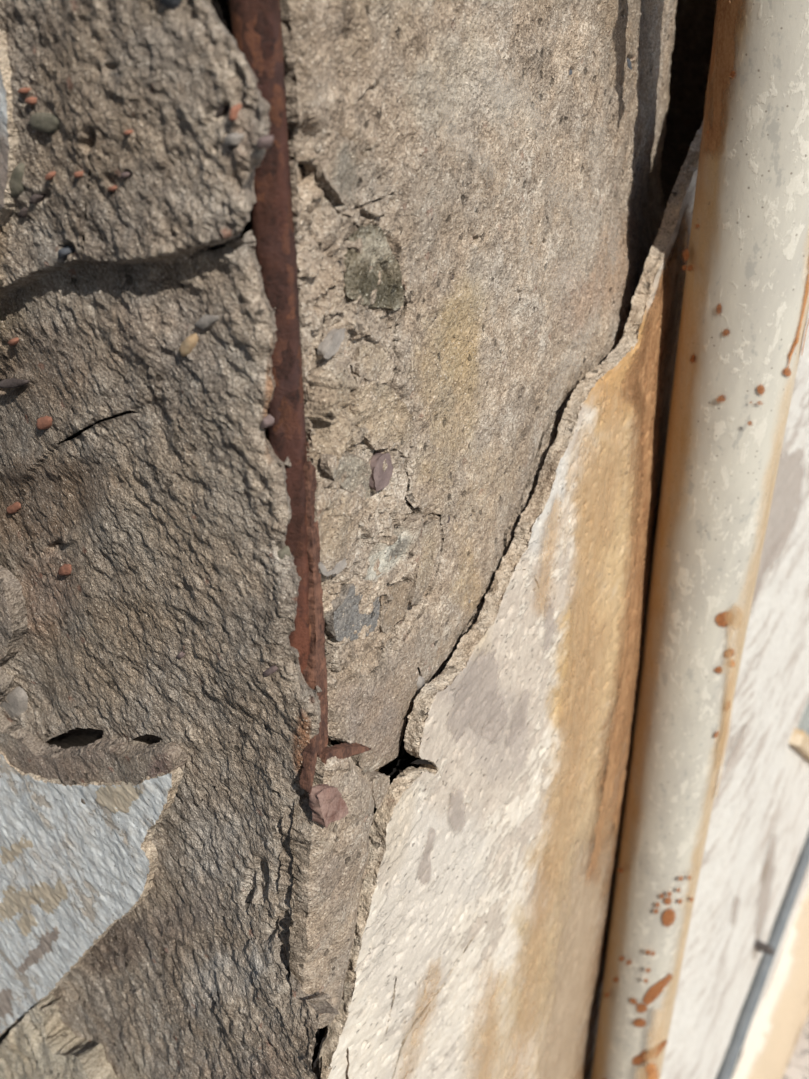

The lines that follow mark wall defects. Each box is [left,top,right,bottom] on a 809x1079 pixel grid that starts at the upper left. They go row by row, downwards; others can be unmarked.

rust [783,275,809,376]
spalling [0,0,348,1079]
rust [576,211,700,1079]
rust [715,612,735,627]
rust [715,648,735,673]
crack [388,746,437,785]
crack [287,802,295,988]
damp [537,838,609,1079]
crack [313,1025,328,1068]